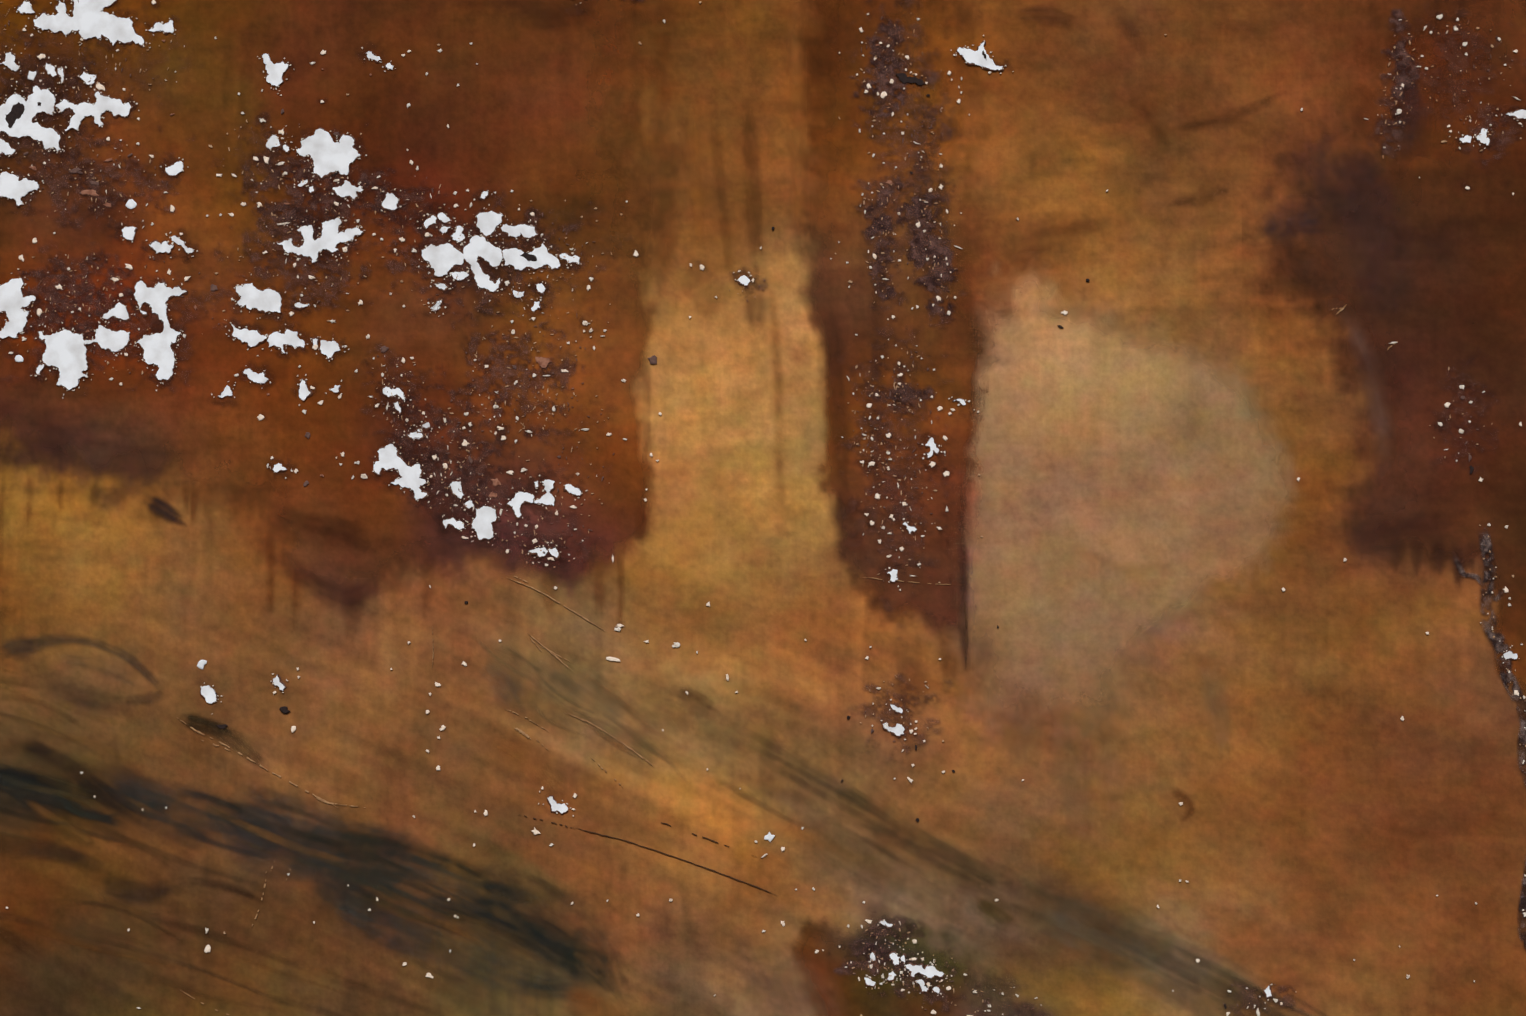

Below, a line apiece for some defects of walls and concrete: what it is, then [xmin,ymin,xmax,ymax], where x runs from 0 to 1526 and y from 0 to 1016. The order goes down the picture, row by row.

peeling [0,0,627,568]
corrosion [0,0,655,604]
corrosion [807,0,983,640]
peeling [847,675,944,783]
peeling [815,901,1042,1016]
water stain [965,283,1291,730]
corrosion [1271,0,1526,691]
peeling [1364,10,1526,159]